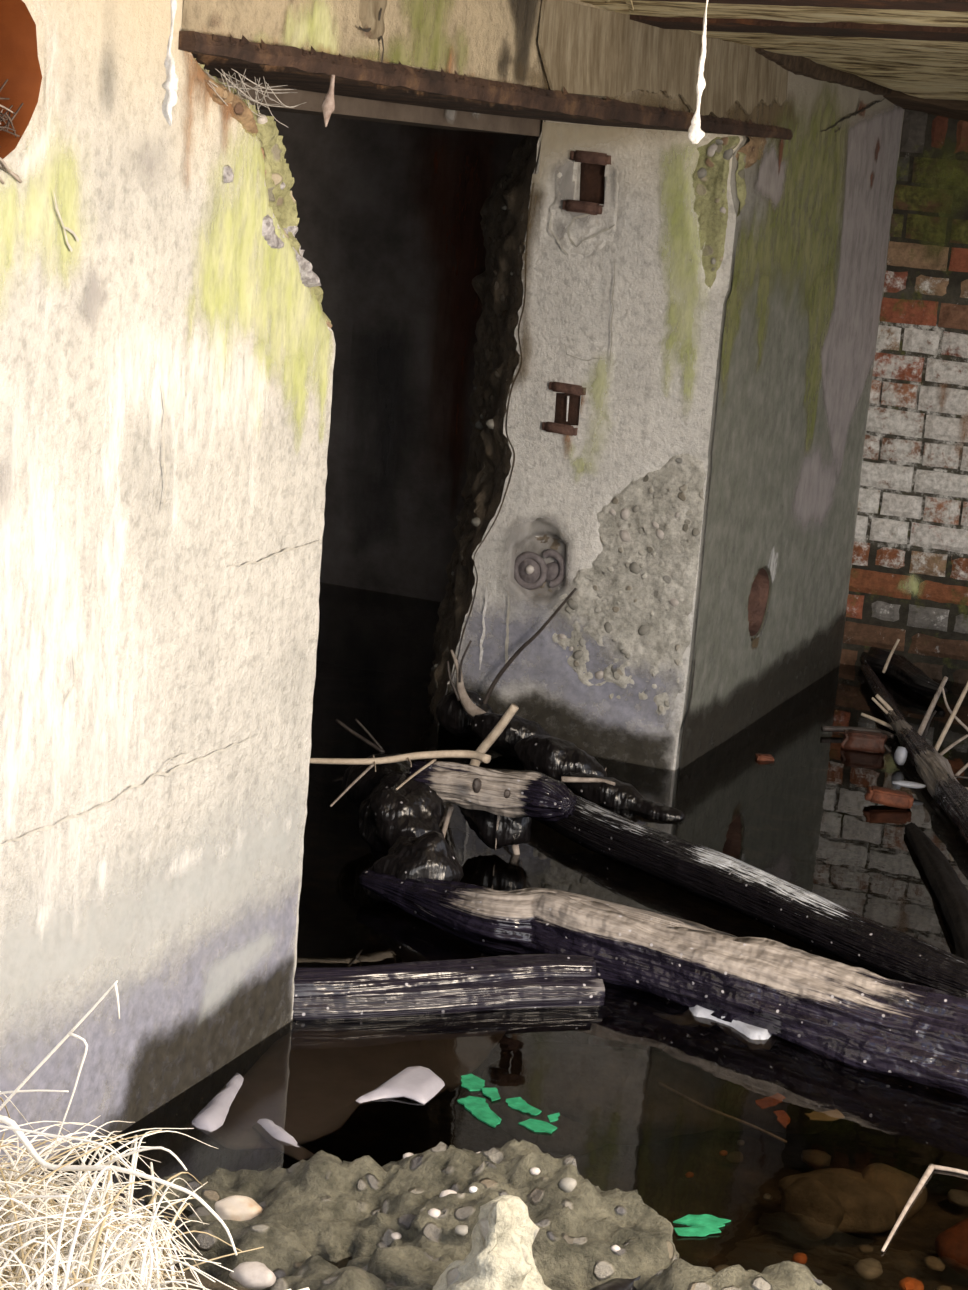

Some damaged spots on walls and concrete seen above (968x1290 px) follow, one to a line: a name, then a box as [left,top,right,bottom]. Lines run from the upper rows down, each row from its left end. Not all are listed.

spalling [195,58,332,328]
spalling [428,120,545,724]
spalling [546,160,619,257]
water stain [722,274,770,383]
water stain [709,99,795,128]
water stain [757,147,785,205]
spalling [512,453,706,730]
water stain [447,519,847,770]